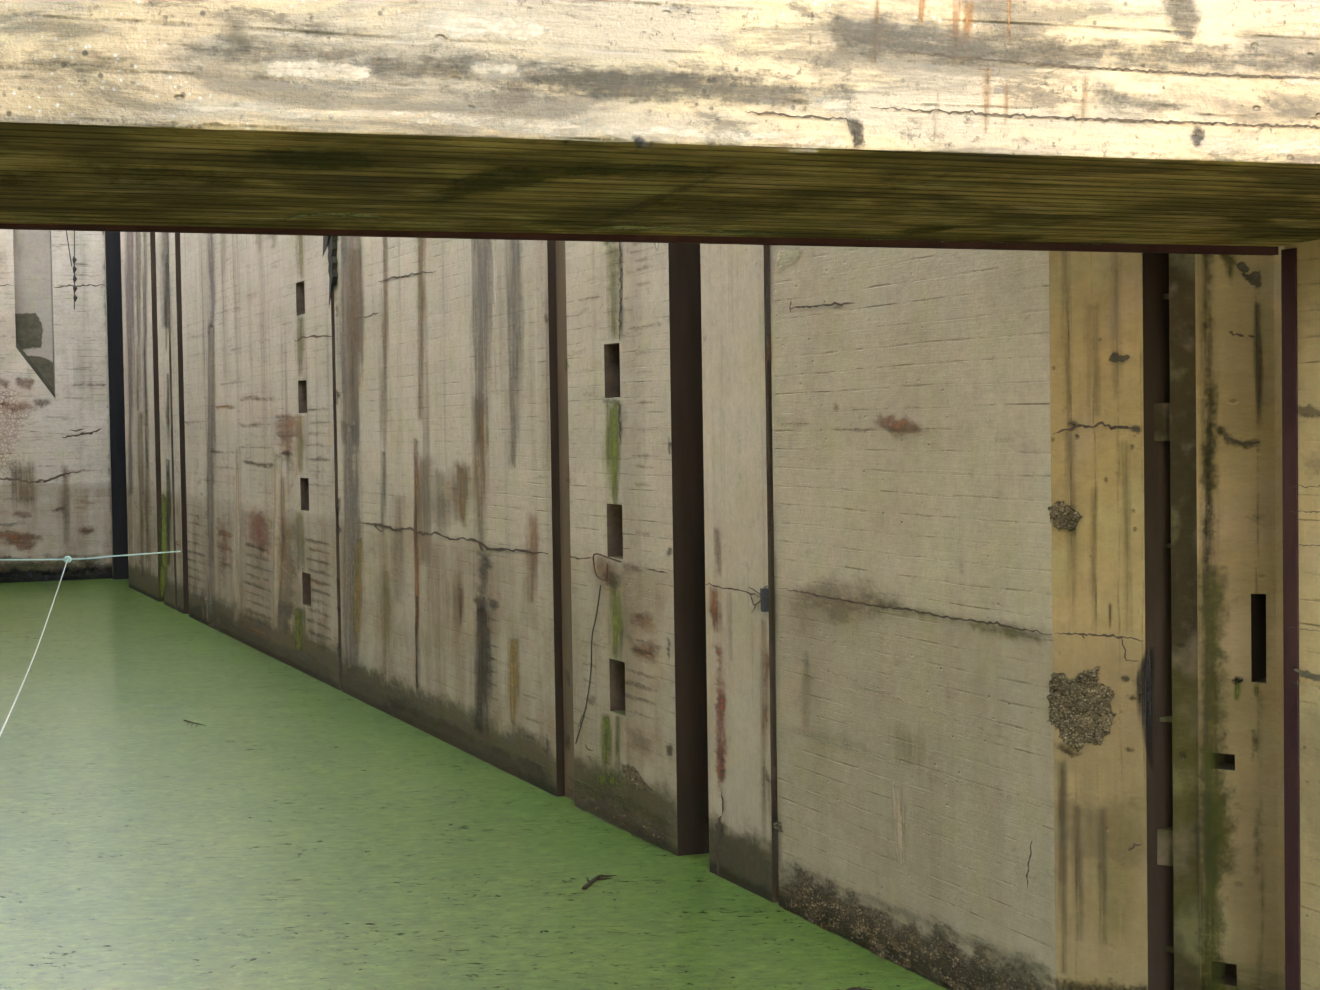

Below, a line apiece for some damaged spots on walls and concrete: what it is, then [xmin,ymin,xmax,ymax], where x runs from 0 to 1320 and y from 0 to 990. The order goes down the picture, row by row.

crack [0,469,85,484]
crack [62,429,100,438]
leakage [190,234,332,681]
leakage [340,236,363,670]
crack [355,522,591,560]
leakage [437,223,521,533]
corrosion [835,415,917,432]
spalling [1048,501,1082,531]
leakage [475,558,498,728]
crack [705,583,1140,662]
spalling [1046,649,1154,766]
leakage [1198,408,1259,990]